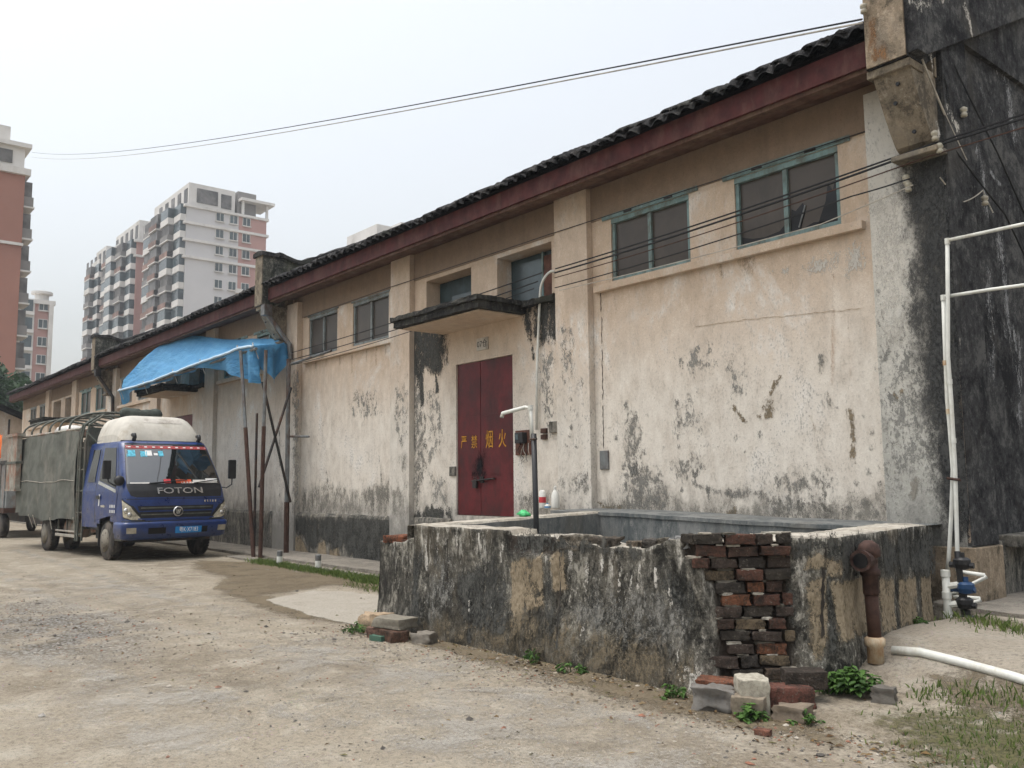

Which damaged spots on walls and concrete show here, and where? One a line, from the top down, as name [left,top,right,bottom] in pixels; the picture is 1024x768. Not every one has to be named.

leakage [975,147,1001,217]
leakage [993,68,1019,141]
leakage [292,331,452,561]
leakage [522,295,582,448]
peeling [732,375,782,423]
leakage [603,54,970,654]
leakage [985,232,1022,426]
leakage [408,528,696,695]